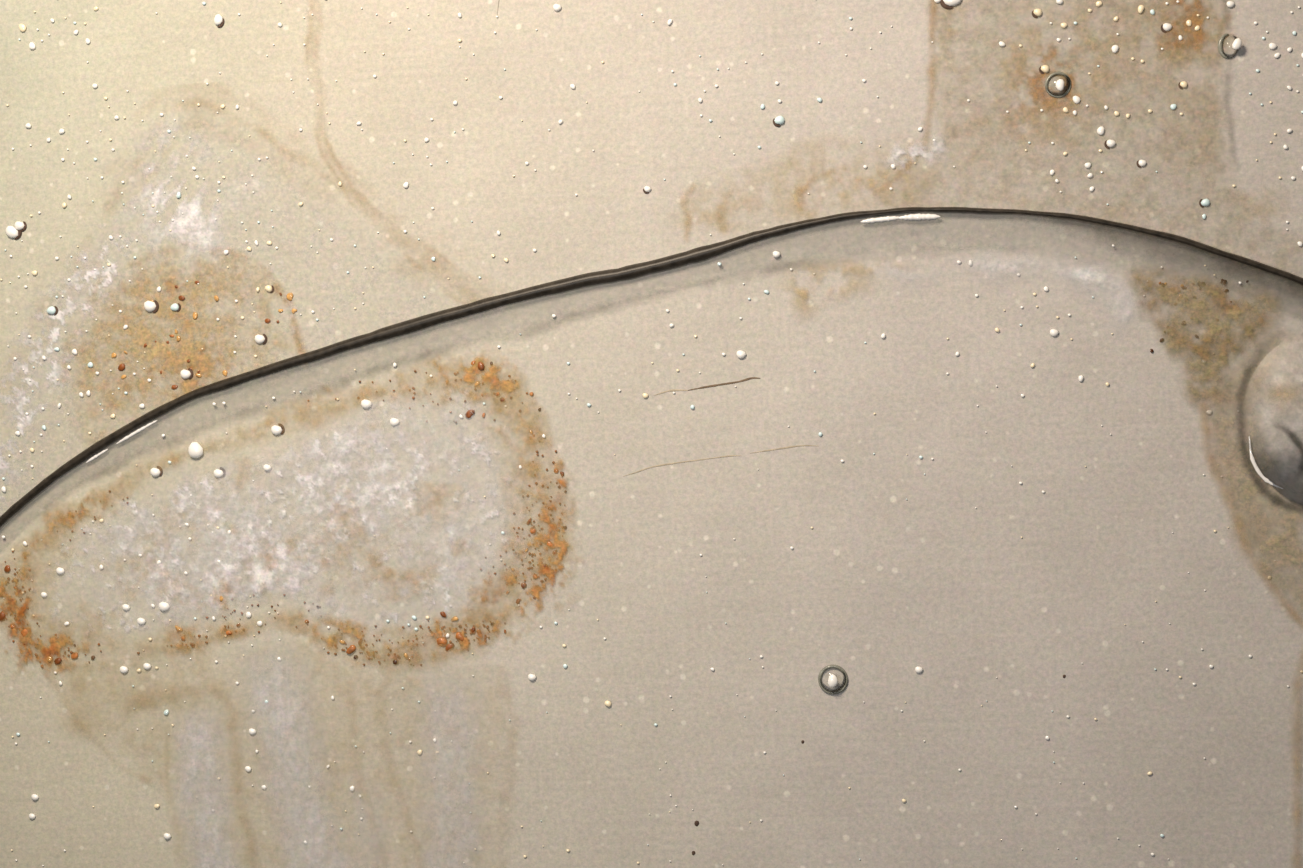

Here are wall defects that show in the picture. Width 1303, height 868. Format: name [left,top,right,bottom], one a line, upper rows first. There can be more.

leakage [1159,0,1204,53]
leakage [1030,73,1073,111]
leakage [140,162,268,251]
leakage [0,243,122,474]
corrosion [83,276,234,406]
corrosion [265,293,297,323]
corrosion [49,503,96,541]
corrosion [357,357,568,612]
leakage [1215,411,1303,577]
corrosion [0,551,102,671]
corrosion [167,594,285,652]
corrosion [295,601,506,666]